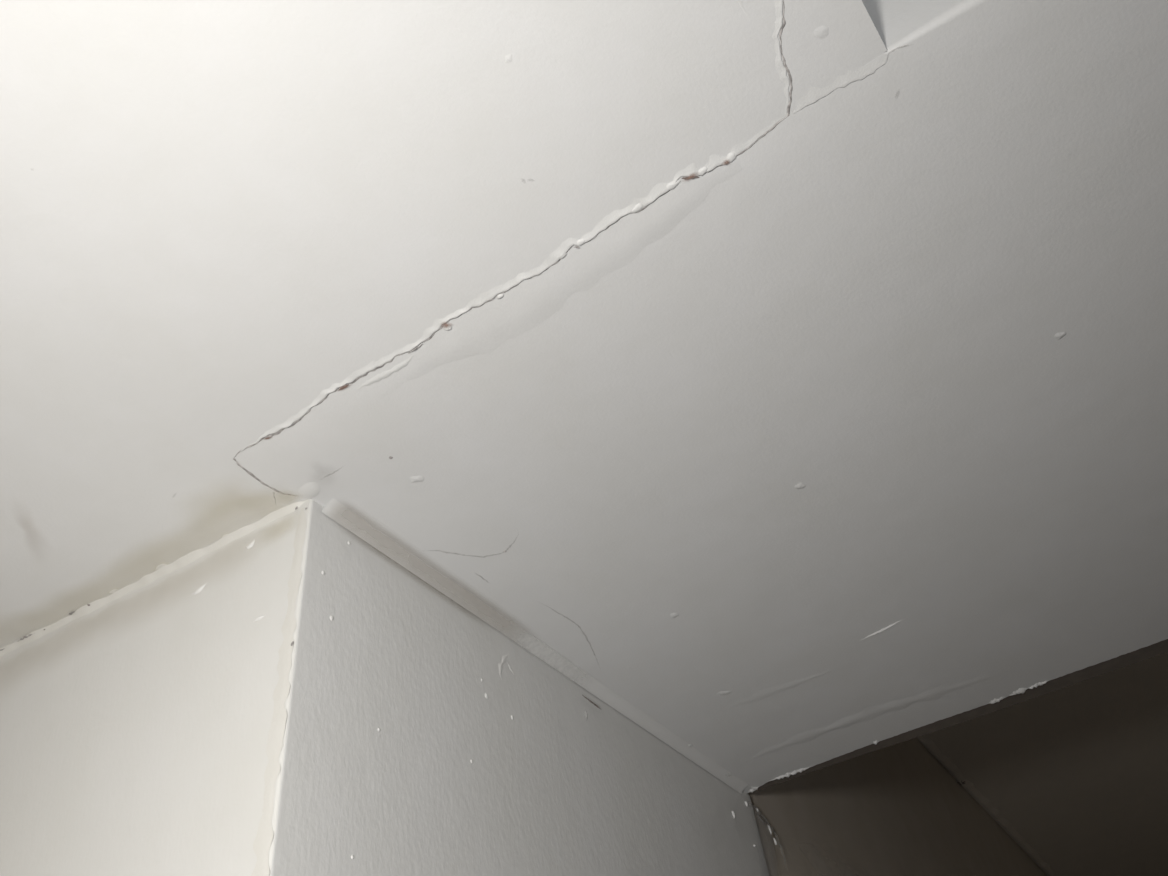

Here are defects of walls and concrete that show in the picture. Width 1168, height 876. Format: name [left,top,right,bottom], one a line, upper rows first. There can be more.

crack [0,0,793,657]